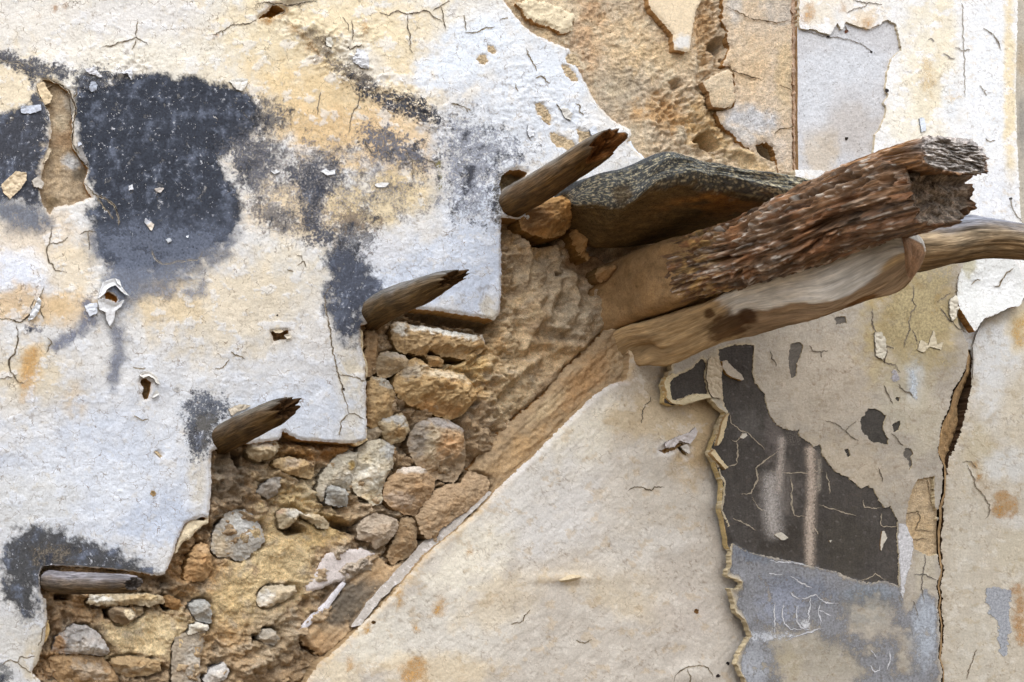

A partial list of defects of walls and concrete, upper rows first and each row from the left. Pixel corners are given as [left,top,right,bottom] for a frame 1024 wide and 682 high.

flaking render [1,81,90,214]
water stain [0,28,539,350]
flaking render [504,0,796,175]
water stain [107,327,124,389]
water stain [177,390,229,464]
flaking render [32,224,655,682]
crack [324,288,367,435]
peeling [658,342,937,585]
flaking render [873,332,887,360]
crack [871,274,991,682]
water stain [0,524,154,618]
water stain [0,663,13,682]